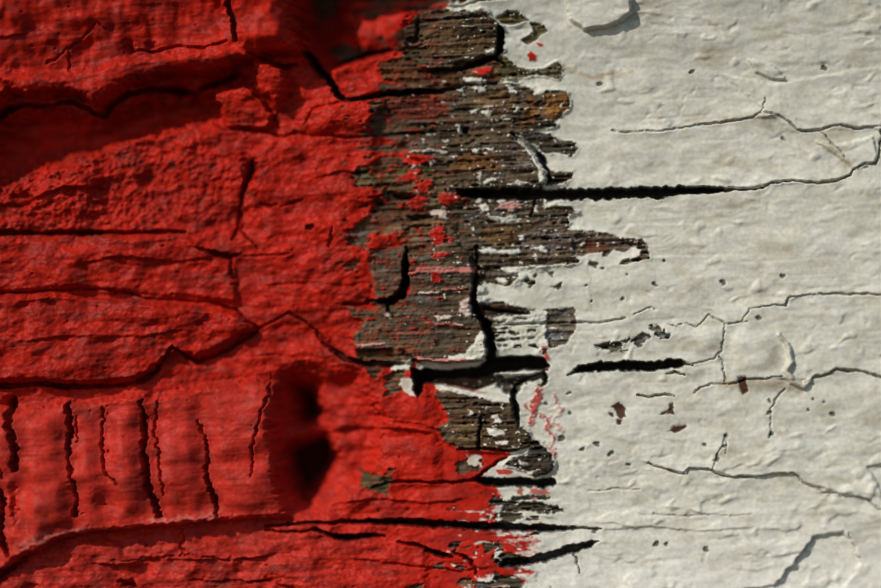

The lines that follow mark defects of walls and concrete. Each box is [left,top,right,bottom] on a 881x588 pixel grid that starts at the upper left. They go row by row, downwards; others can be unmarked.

crack [0,0,508,141]
crack [0,158,305,276]
crack [305,223,335,249]
crack [368,193,418,201]
peeling [313,0,650,397]
crack [456,96,881,217]
peeling [595,325,675,354]
crack [0,245,881,588]
peeling [429,374,555,479]
peeling [360,468,394,498]
peeling [433,535,525,588]
peeling [487,495,564,524]